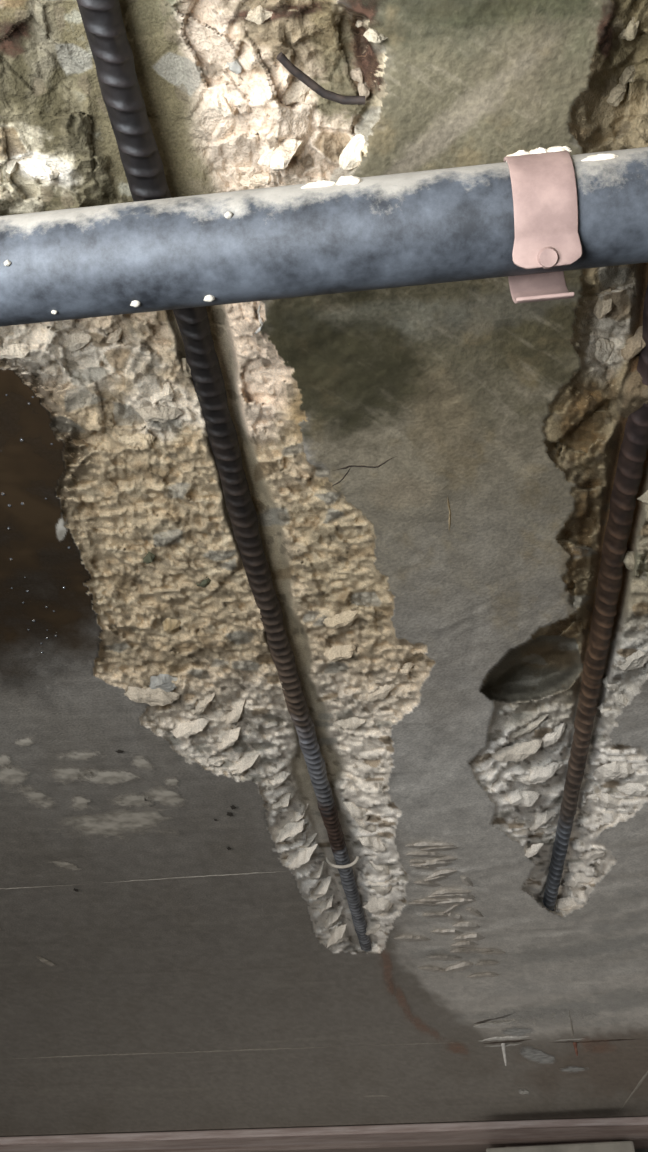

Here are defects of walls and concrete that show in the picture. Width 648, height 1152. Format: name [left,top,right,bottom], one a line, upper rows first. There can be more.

spalling [0,0,389,216]
spalling [568,0,648,154]
spalling [0,301,436,955]
spalling [469,263,648,917]
damp [0,755,53,808]
damp [53,752,184,837]